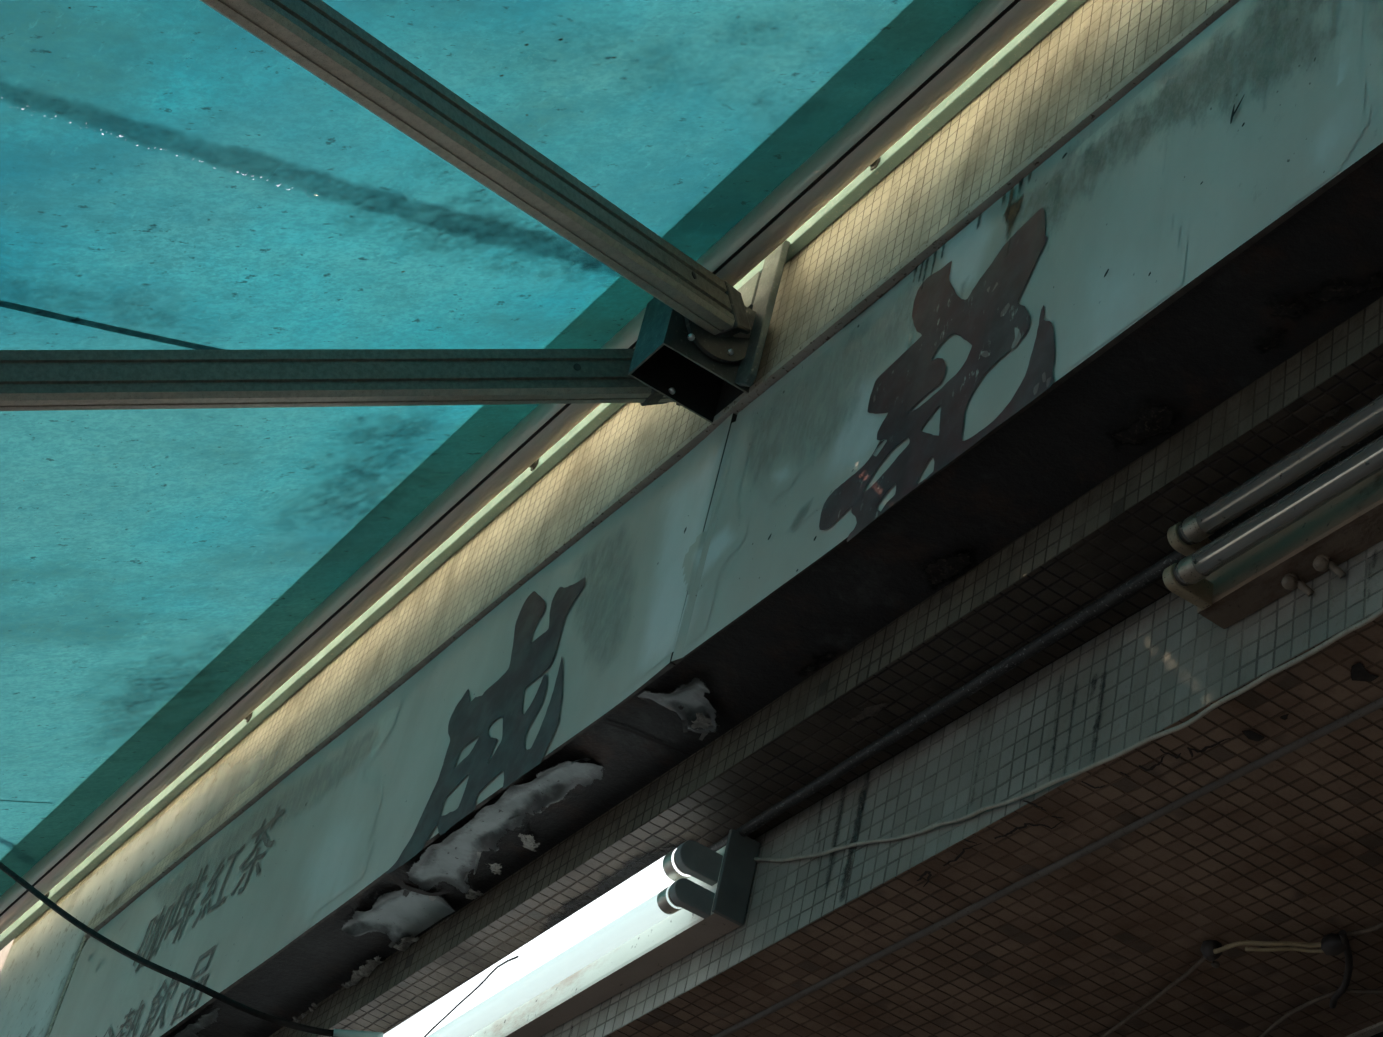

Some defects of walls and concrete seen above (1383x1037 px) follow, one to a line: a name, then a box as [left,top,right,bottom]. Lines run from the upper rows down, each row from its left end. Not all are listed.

peeling [638,677,718,741]
peeling [341,758,604,989]
damp [818,773,869,900]